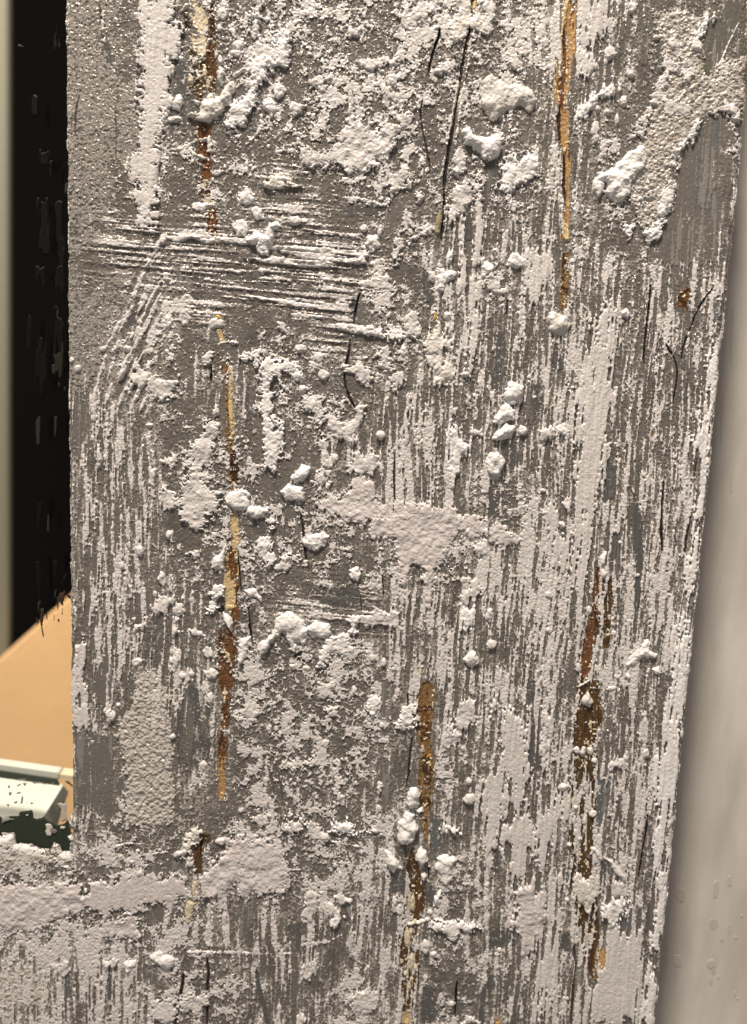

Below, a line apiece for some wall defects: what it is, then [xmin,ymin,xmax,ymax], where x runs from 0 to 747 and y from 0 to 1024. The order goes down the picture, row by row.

crack [419,0,474,240]
corrosion [560,252,570,312]
corrosion [221,362,237,491]
corrosion [215,537,240,770]
corrosion [415,681,435,846]